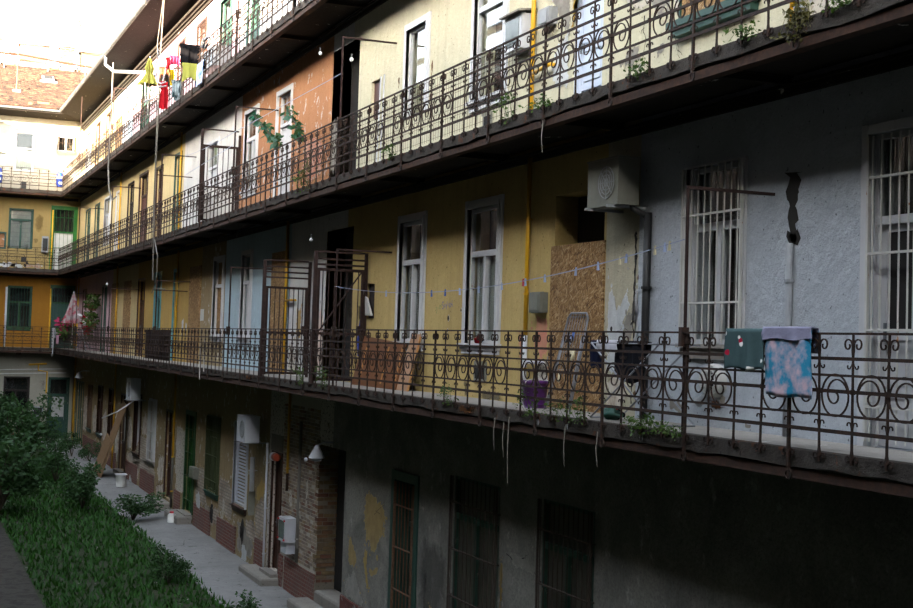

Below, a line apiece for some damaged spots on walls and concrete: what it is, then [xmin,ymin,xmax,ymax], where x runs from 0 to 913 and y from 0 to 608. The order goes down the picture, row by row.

peeling [344,492,387,608]